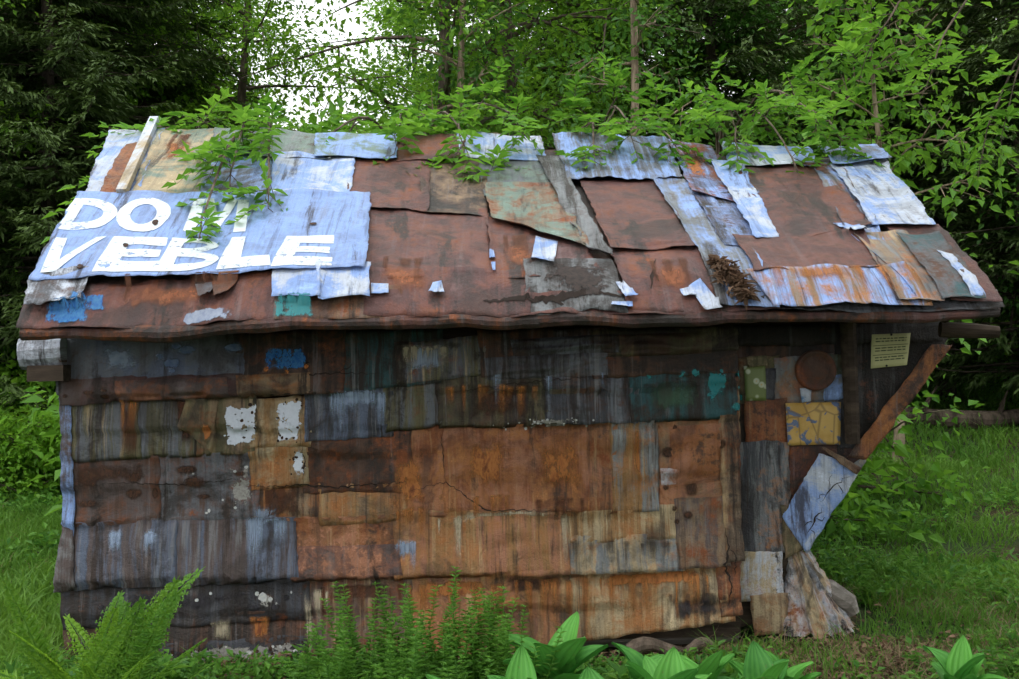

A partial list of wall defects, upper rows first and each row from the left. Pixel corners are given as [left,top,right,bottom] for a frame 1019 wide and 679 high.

corrosion [682,147,714,181]
corrosion [544,264,608,297]
corrosion [802,265,841,276]
peeling [46,292,104,323]
peeling [263,349,308,374]
peeling [679,369,743,411]
peeling [223,403,256,446]
peeling [276,398,306,475]
corrosion [176,466,210,499]
crack [70,437,560,512]
corrosion [322,577,587,616]
corrosion [600,570,708,605]